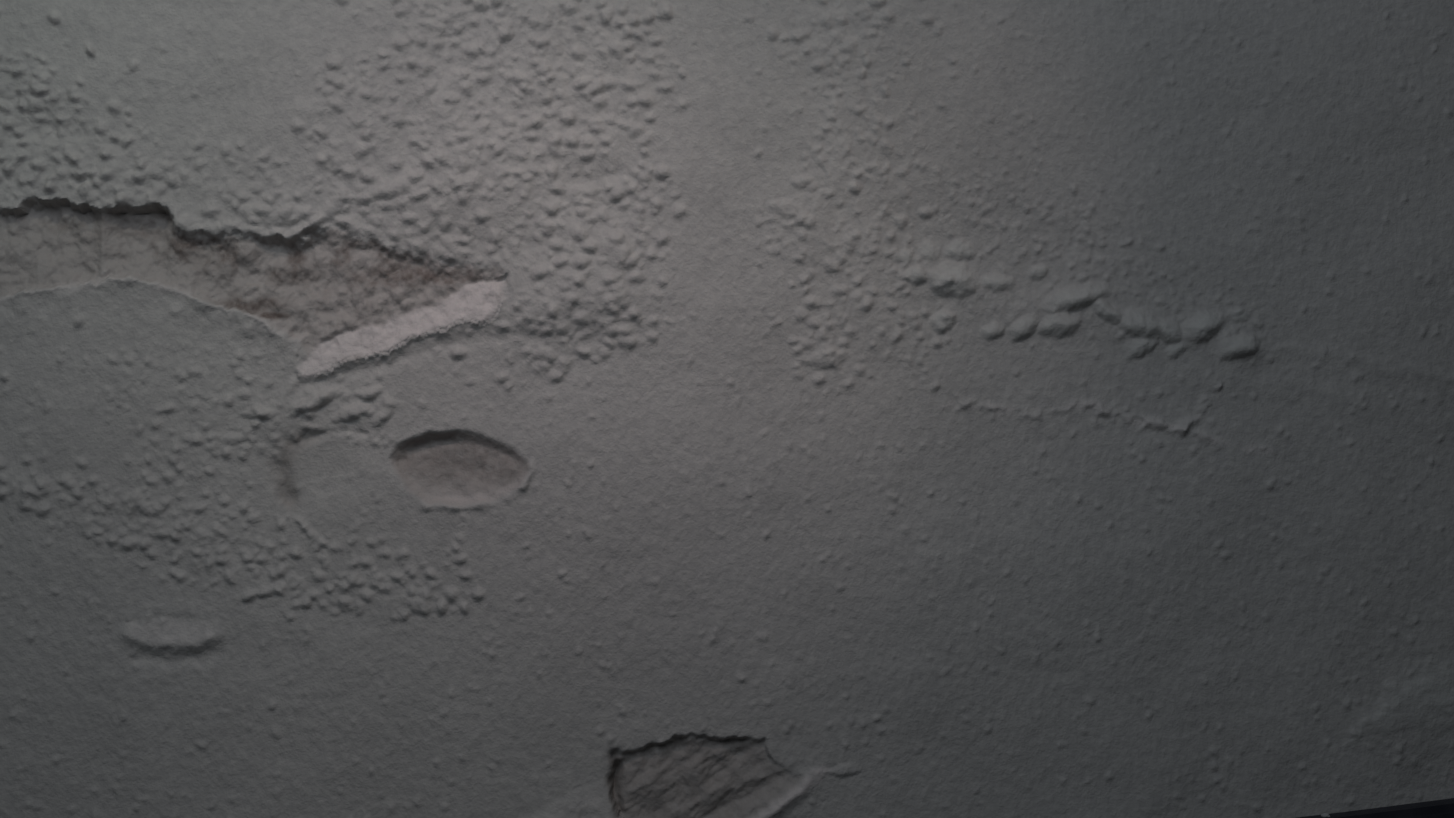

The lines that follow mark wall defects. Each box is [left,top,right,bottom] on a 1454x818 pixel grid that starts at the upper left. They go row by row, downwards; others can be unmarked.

peeling [0,183,509,379]
spalling [388,428,541,513]
spalling [521,732,836,818]